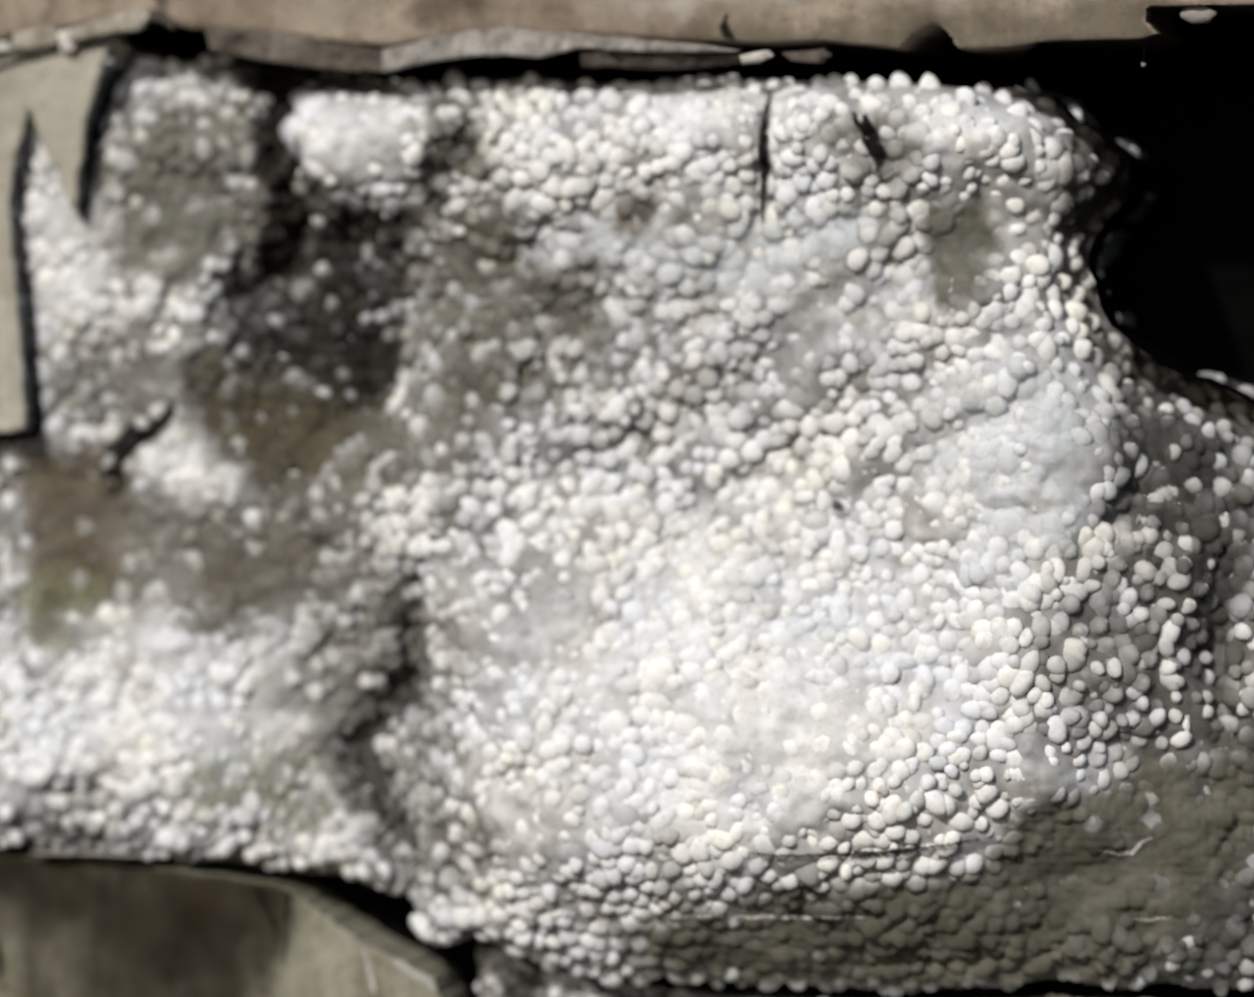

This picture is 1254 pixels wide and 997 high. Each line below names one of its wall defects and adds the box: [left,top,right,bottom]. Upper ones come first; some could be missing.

crack [0,50,62,70]
peeling [0,47,110,433]
spalling [852,111,886,172]
water stain [26,64,602,885]